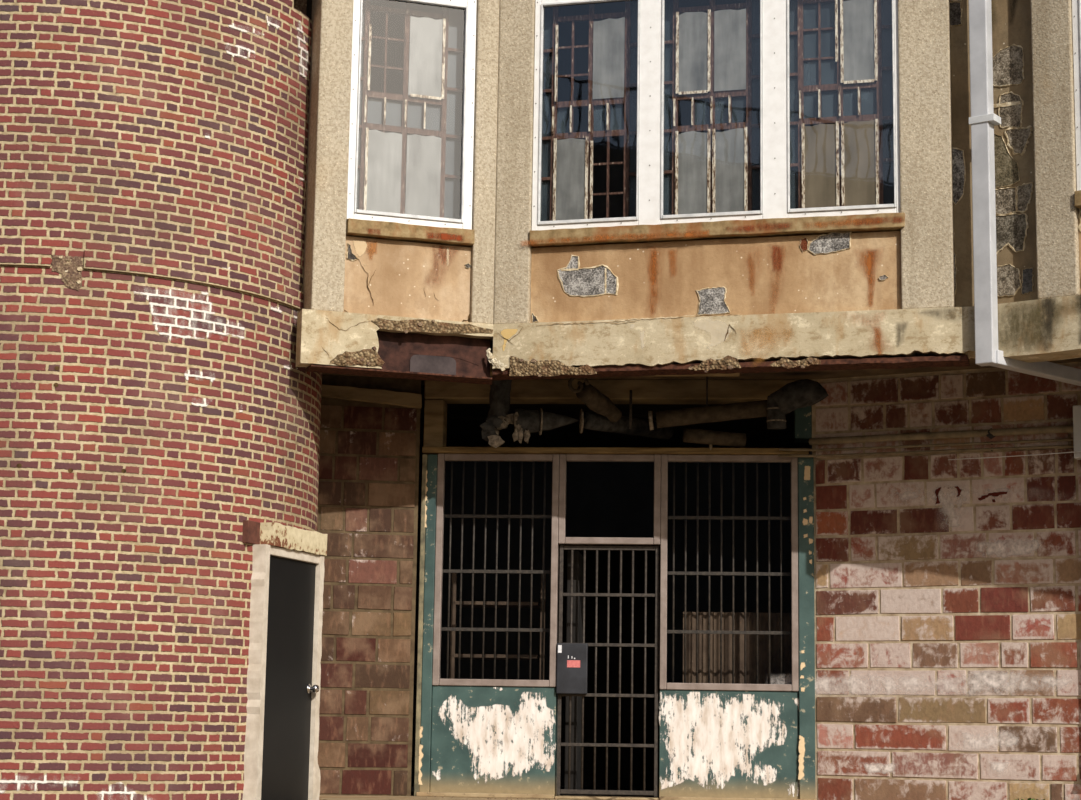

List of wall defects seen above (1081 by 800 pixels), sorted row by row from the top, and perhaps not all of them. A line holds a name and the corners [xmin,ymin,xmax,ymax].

spalling [950,0,962,27]
spalling [952,148,966,205]
spalling [992,44,1034,297]
spalling [799,232,851,255]
spalling [329,346,385,366]
spalling [371,318,597,377]
spalling [557,255,619,298]
spalling [696,287,730,316]
rust [864,252,874,304]
water stain [1000,298,1059,345]
peeling [439,692,556,783]
peeling [659,650,805,797]